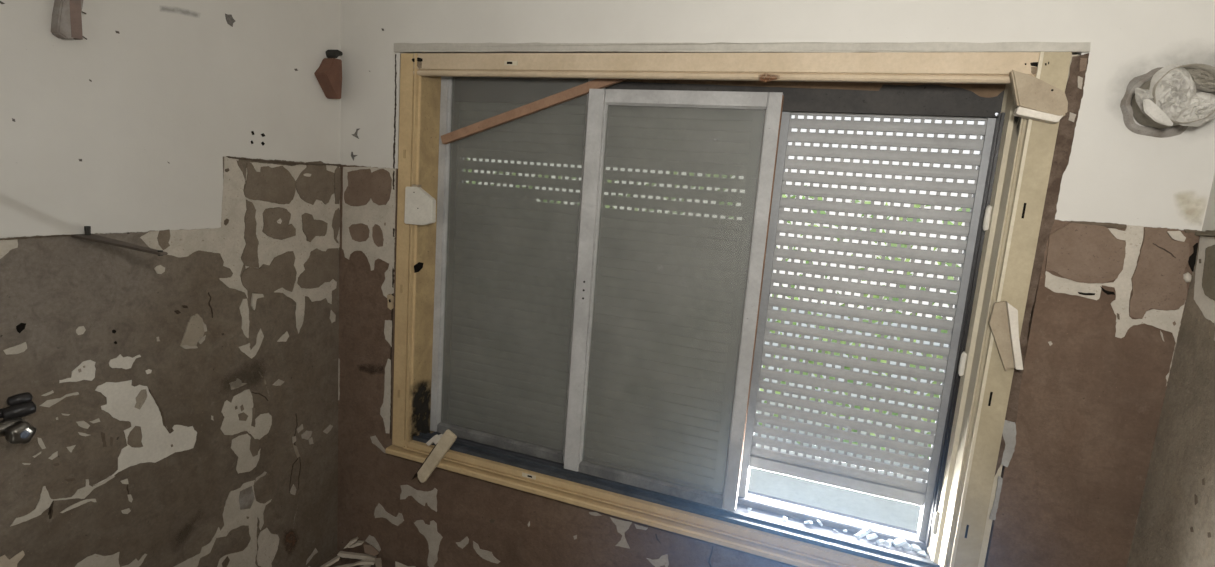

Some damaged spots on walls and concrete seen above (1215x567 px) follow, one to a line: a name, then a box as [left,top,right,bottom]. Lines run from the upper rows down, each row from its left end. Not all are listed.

spalling [1184,229,1198,272]
spalling [175,305,207,349]
flaking render [22,413,113,466]
peeling [60,499,96,513]